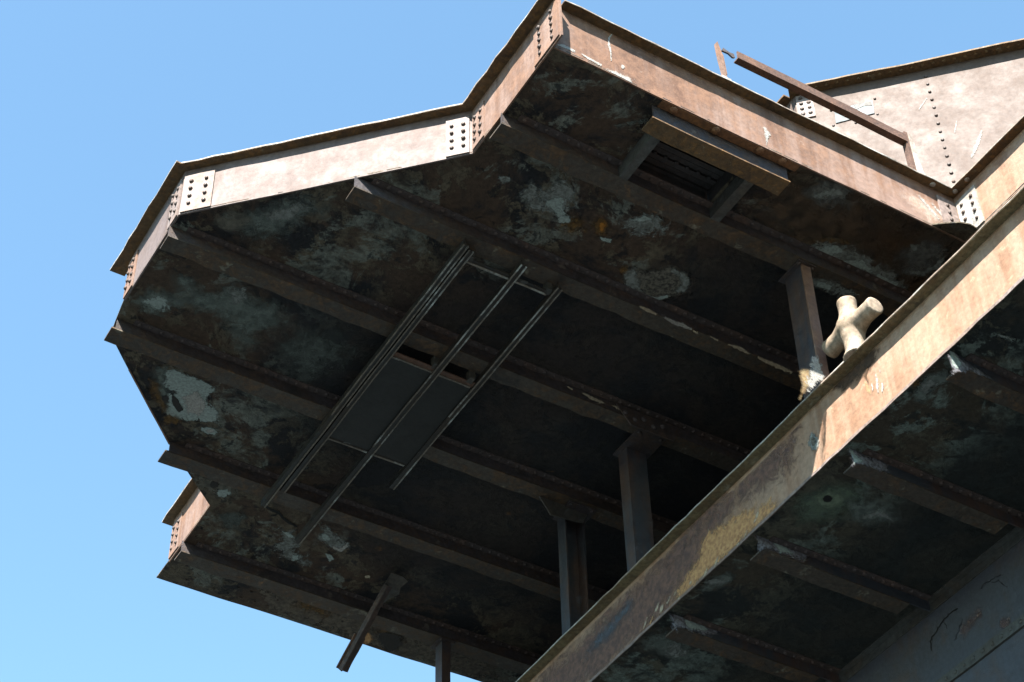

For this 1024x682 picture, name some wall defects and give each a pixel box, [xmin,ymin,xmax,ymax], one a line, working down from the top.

water stain [217,197,326,238]
corrosion [657,100,974,281]
water stain [133,275,287,344]
peeling [150,367,219,435]
corrosion [833,349,878,392]
corrosion [537,427,800,682]